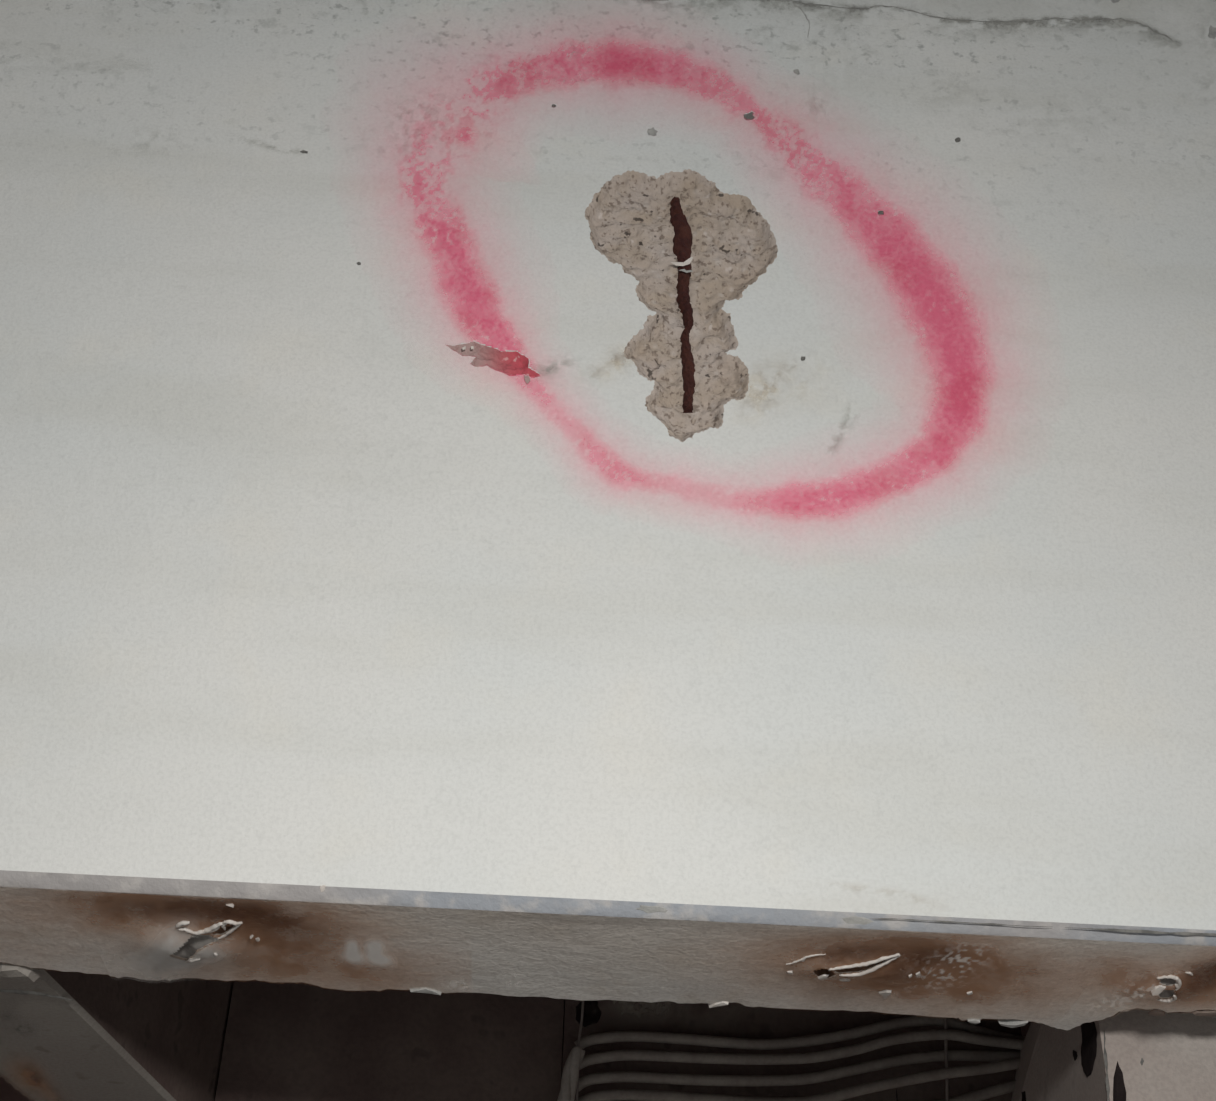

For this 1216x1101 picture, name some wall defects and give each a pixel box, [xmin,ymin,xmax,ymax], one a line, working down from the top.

crack [642,0,1180,46]
spalling [585,169,778,442]
rust [41,890,431,991]
rust [752,932,1052,1008]
rust [1082,954,1216,1007]